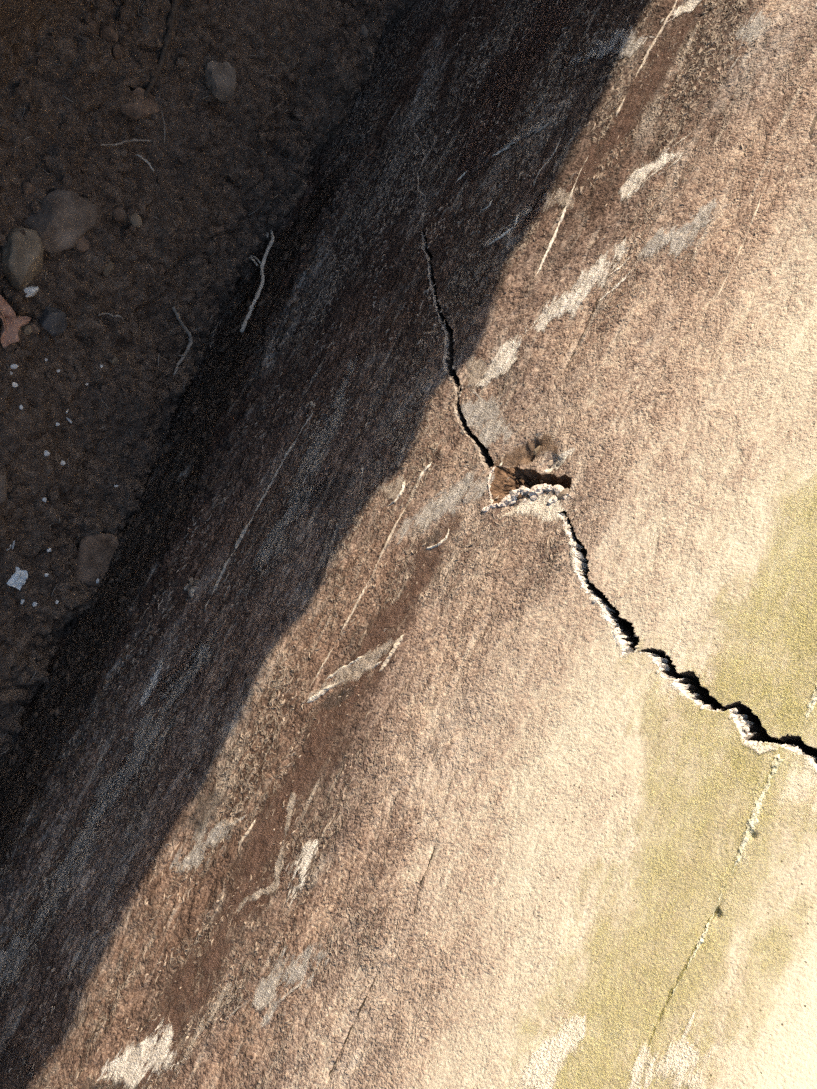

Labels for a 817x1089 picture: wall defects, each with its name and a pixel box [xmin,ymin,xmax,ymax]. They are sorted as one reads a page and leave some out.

crack [412,98,534,469]
spalling [481,435,575,524]
crack [558,513,817,774]